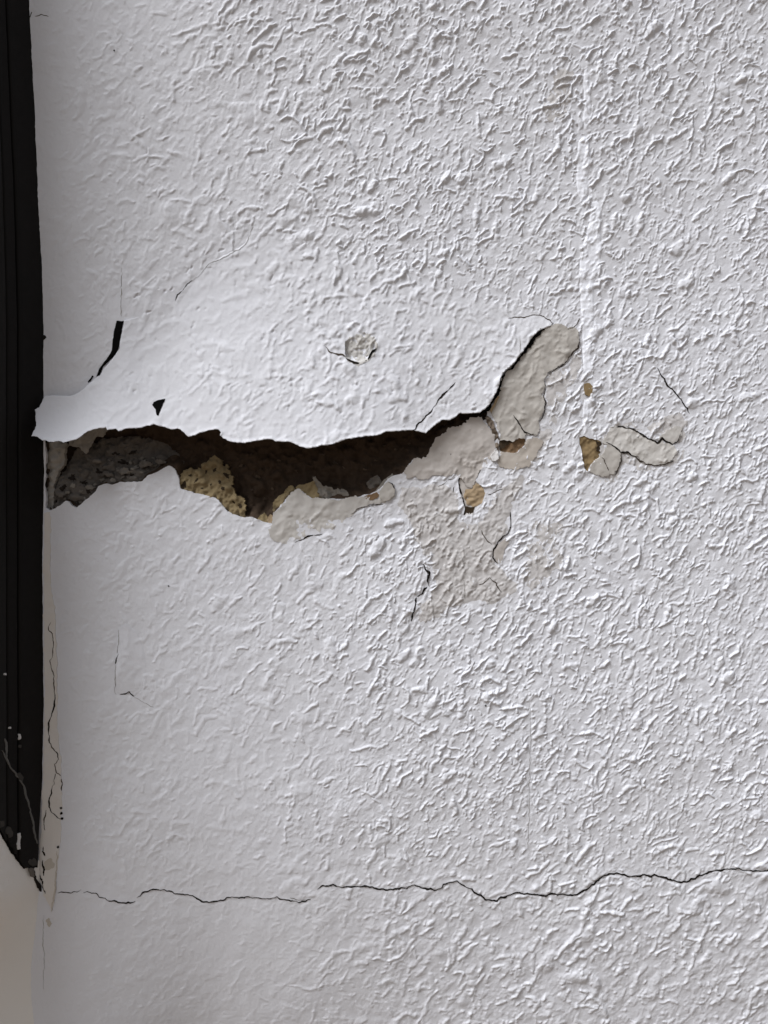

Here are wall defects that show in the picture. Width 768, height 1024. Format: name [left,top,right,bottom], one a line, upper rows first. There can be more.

peeling [32,234,579,544]
peeling [579,426,682,477]
crack [0,624,768,989]